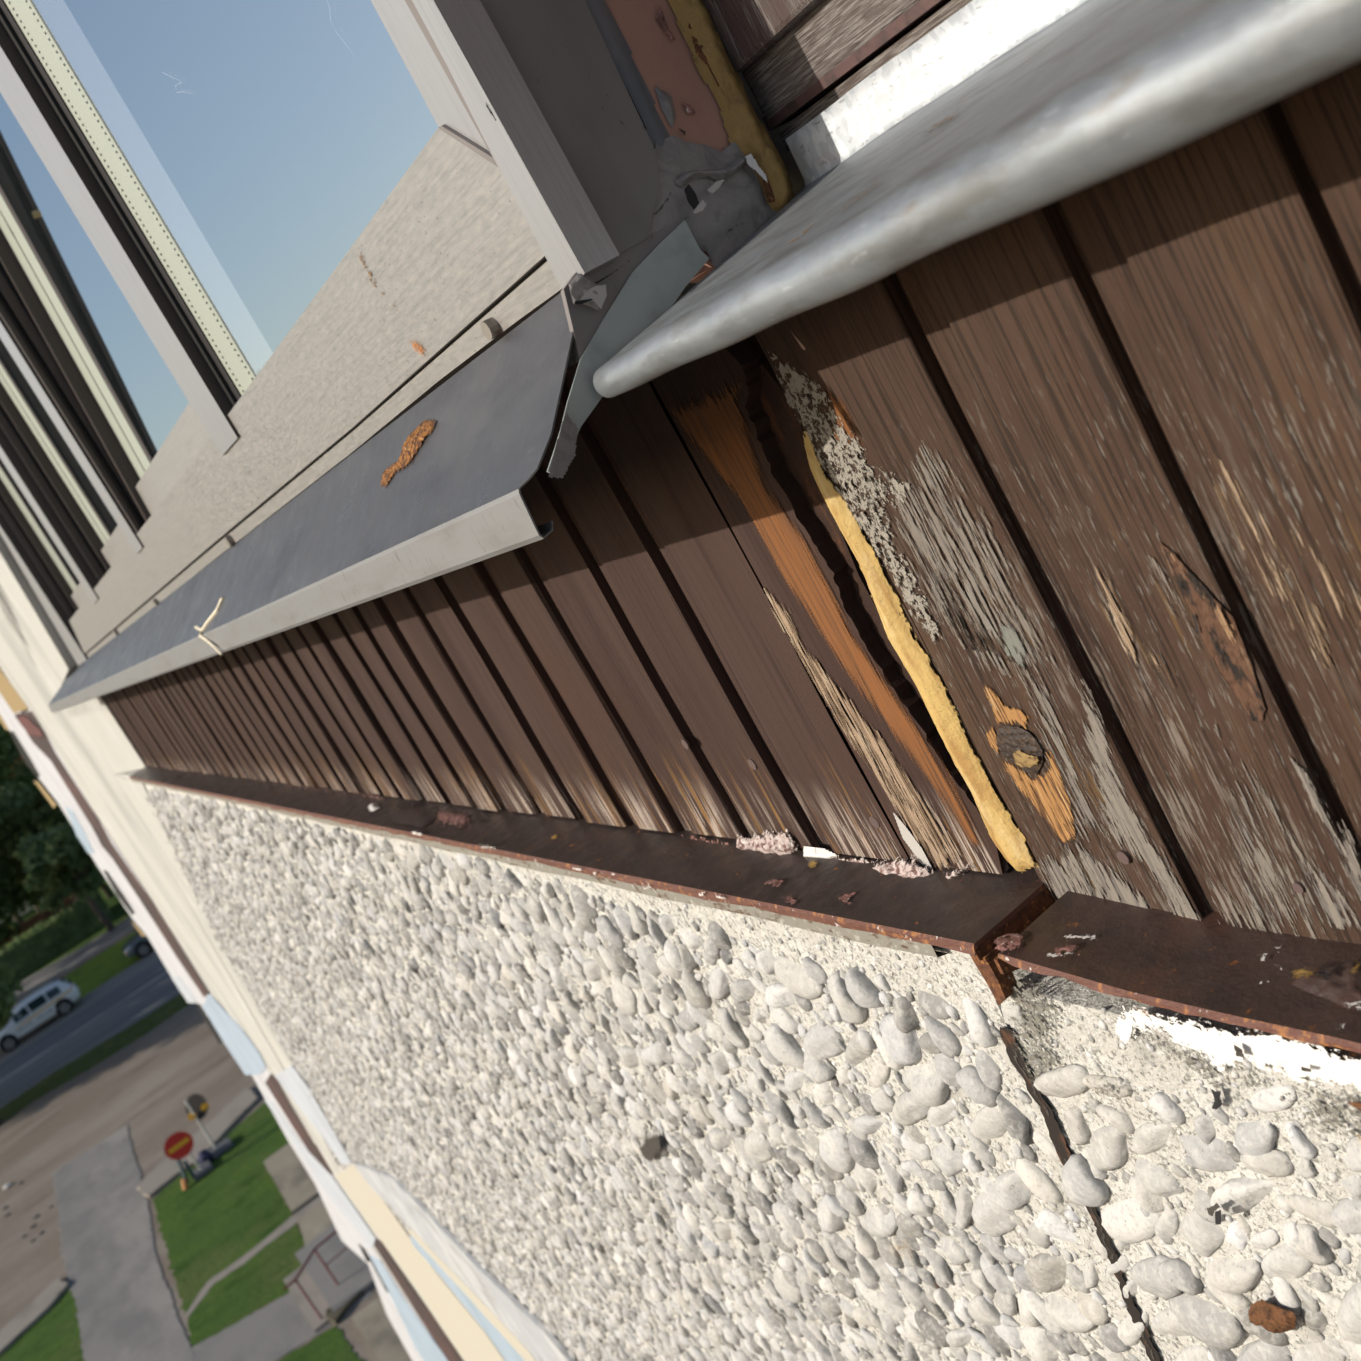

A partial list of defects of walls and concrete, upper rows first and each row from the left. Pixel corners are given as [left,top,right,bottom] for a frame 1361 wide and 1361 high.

peeling [688,23,724,95]
peeling [765,351,1201,920]
spalling [1146,542,1265,722]
peeling [1207,724,1361,971]
peeling [994,933,1023,952]
peeling [1047,934,1096,958]
crack [1000,1027,1071,1166]
crack [1086,1206,1160,1361]
rust [1248,1299,1296,1333]